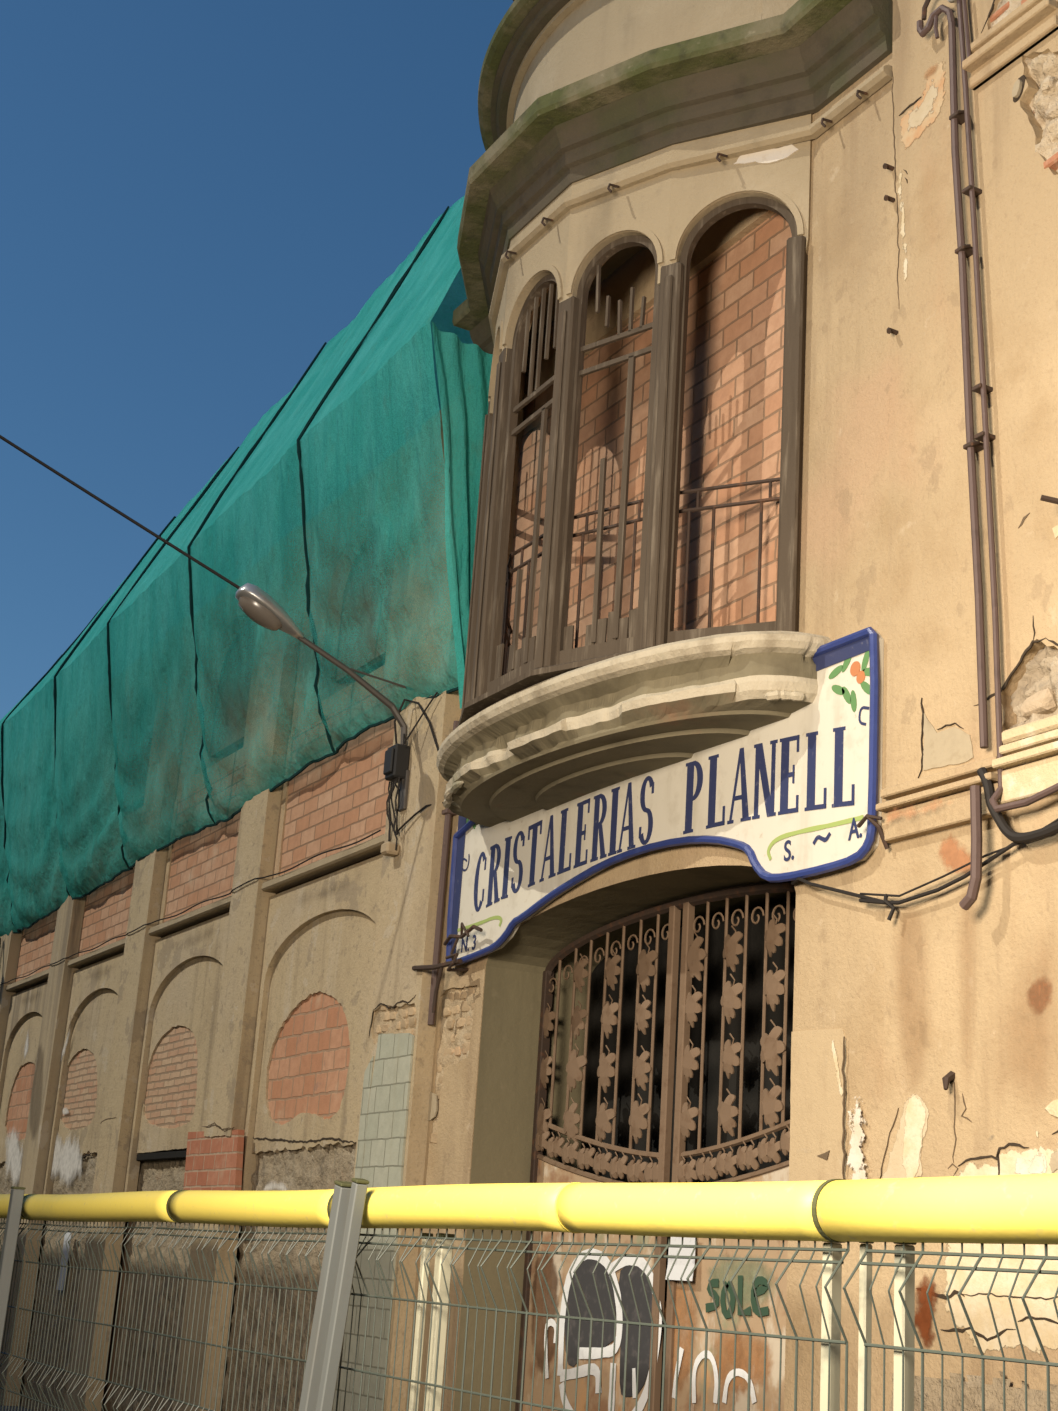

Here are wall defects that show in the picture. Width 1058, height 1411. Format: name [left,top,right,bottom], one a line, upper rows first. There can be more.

spalling [990,0,1027,28]
peeling [899,61,945,149]
spalling [1012,51,1058,172]
spalling [1009,646,1058,729]
corrosion [1028,981,1051,1012]
peeling [1045,1099,1058,1117]
leakage [6,1131,22,1184]
leakage [51,1137,82,1183]
peeling [879,1094,929,1179]
peeling [954,1131,1058,1177]
peeling [944,1243,1058,1354]